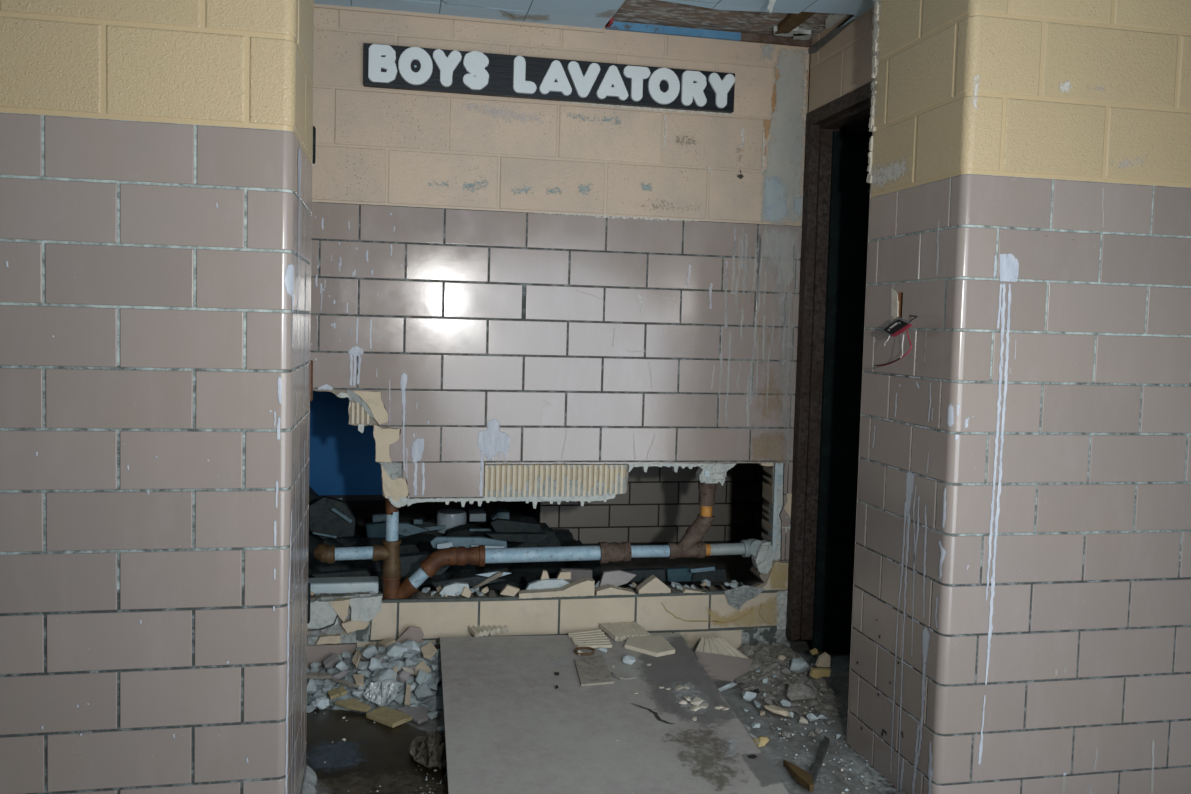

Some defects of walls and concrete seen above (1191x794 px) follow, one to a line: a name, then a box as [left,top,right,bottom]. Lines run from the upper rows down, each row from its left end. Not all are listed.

spalling [337,390,697,509]
spalling [782,493,792,533]
spalling [307,594,396,700]
spalling [518,575,706,599]
spalling [725,561,790,648]
leakage [306,709,448,794]